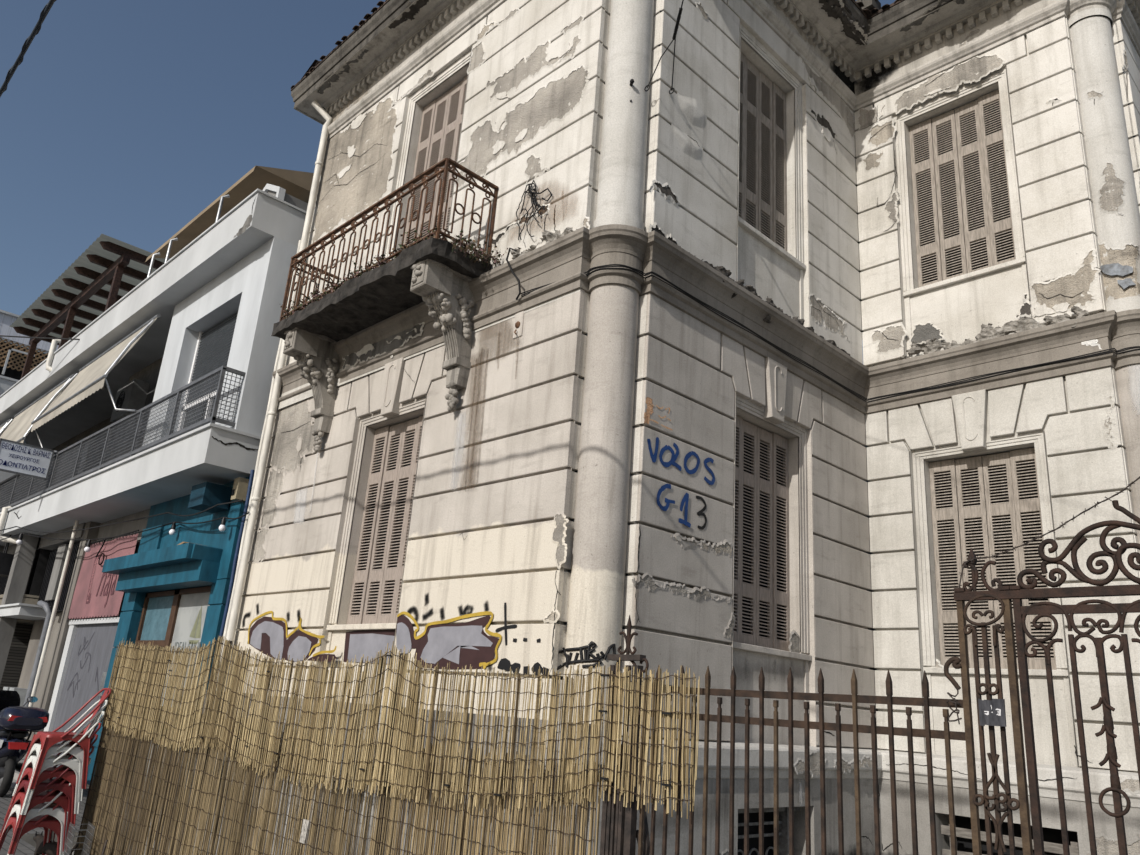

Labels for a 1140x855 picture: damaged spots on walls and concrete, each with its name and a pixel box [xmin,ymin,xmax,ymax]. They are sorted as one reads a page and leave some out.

peeling [312,68,435,244]
peeling [454,7,590,189]
peeling [772,0,1005,232]
peeling [1098,161,1126,216]
peeling [870,241,1140,360]
crack [212,436,259,450]
crack [550,571,561,672]
crack [634,522,642,625]